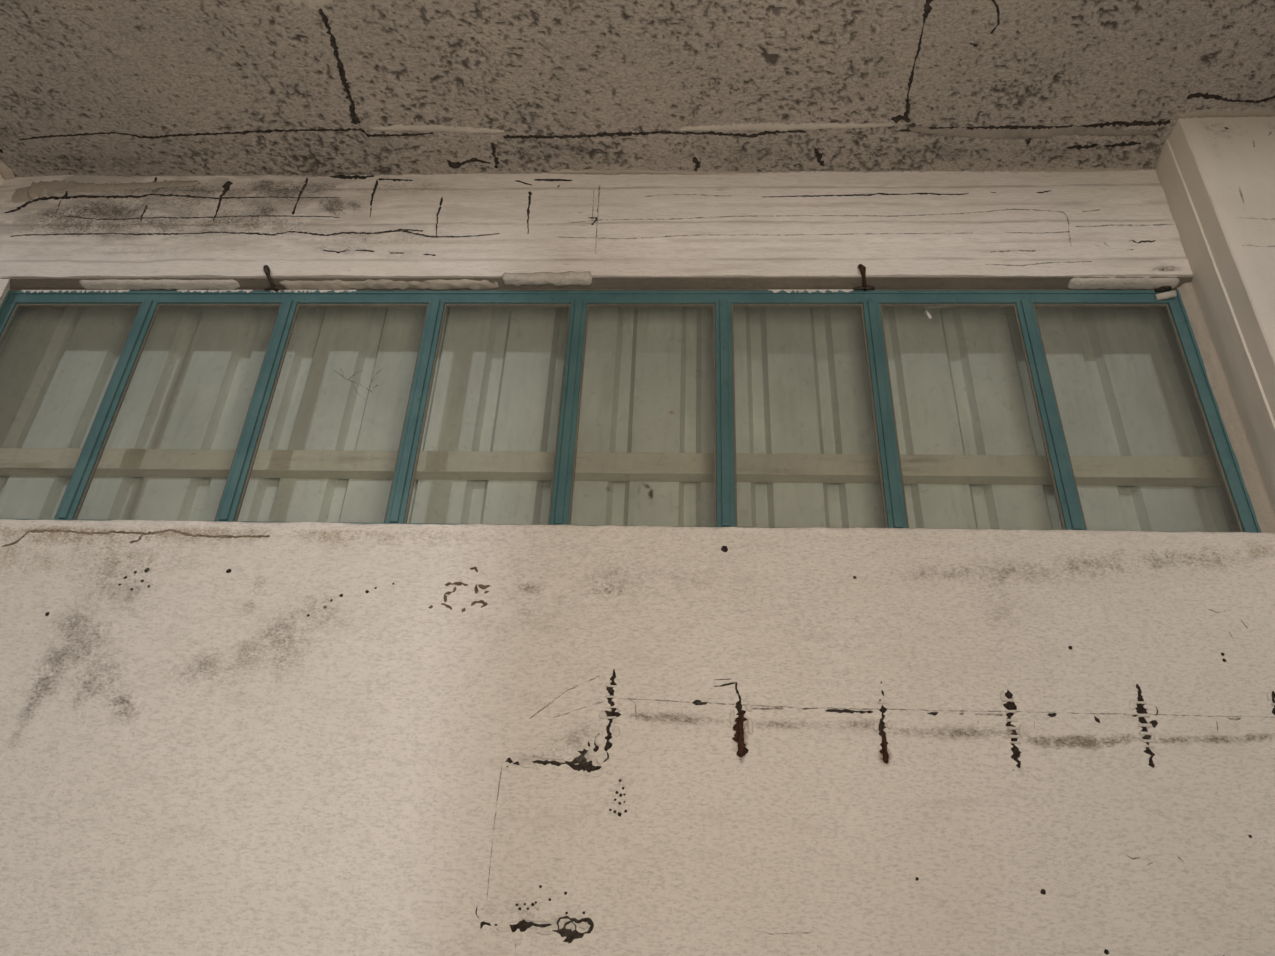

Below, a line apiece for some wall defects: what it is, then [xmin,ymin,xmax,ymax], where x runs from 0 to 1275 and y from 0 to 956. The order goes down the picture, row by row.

crack [970,0,1000,47]
crack [891,115,911,124]
crack [1187,92,1275,129]
crack [1066,141,1141,150]
crack [5,143,1167,266]
crack [529,676,1274,729]